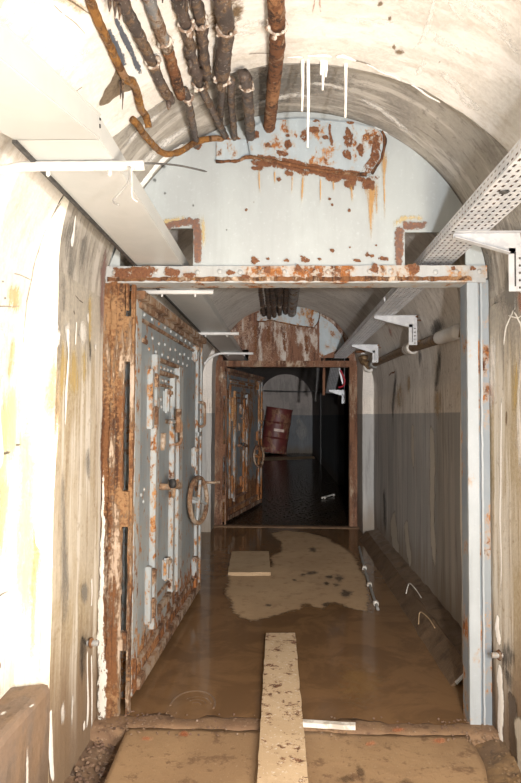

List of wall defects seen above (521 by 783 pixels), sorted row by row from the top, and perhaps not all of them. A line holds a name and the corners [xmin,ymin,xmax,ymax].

rust [251,119,387,229]
damp [9,287,19,309]
damp [66,215,87,274]
rust [100,216,476,324]
damp [0,299,96,673]